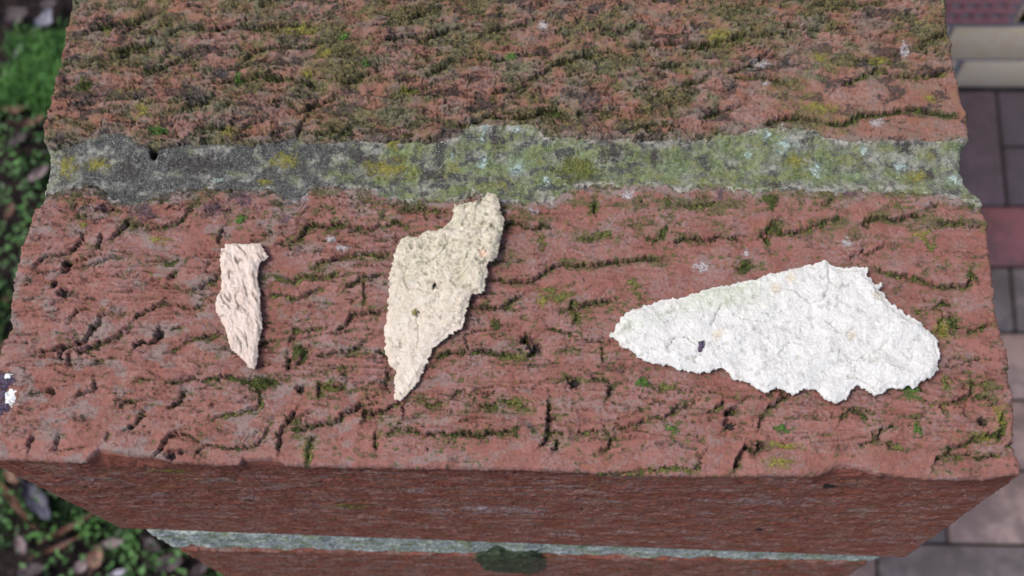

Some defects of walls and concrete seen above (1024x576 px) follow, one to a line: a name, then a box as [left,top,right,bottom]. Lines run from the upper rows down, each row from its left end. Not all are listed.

peeling [215,243,269,370]
peeling [384,192,505,401]